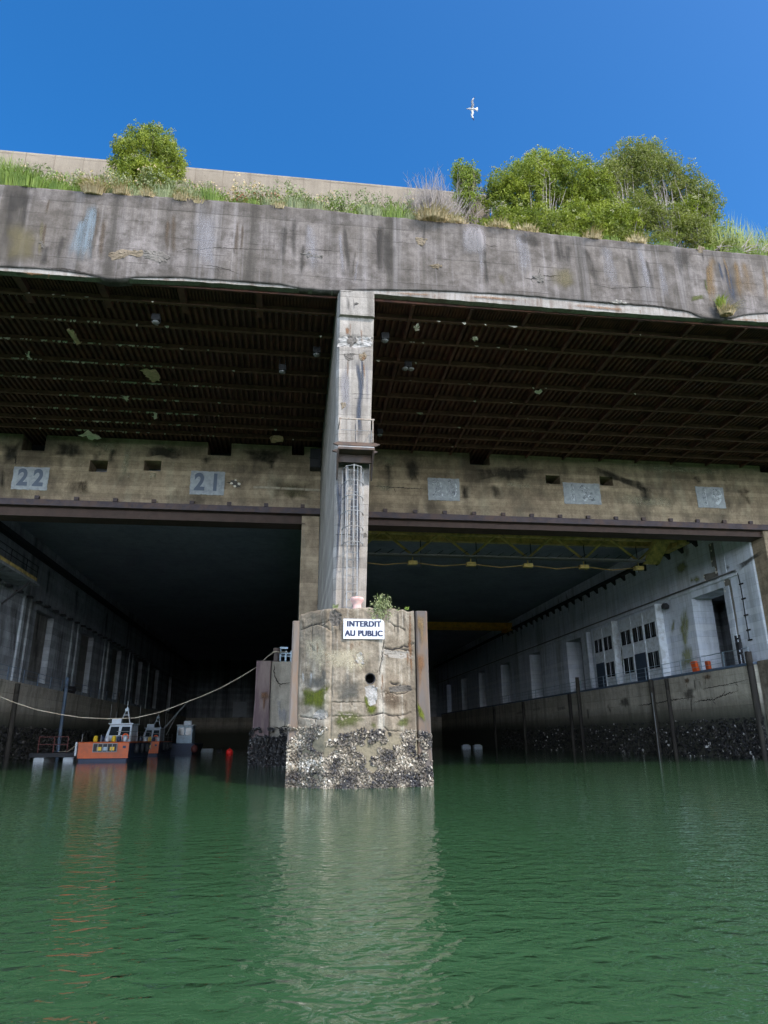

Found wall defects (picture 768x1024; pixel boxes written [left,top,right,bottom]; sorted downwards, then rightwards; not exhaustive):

water stain [75,210,104,252]
peeling [0,317,101,360]
spalling [337,336,380,362]
peeling [61,360,221,388]
water stain [599,470,647,500]
spalling [365,684,412,706]
crack [639,679,749,706]